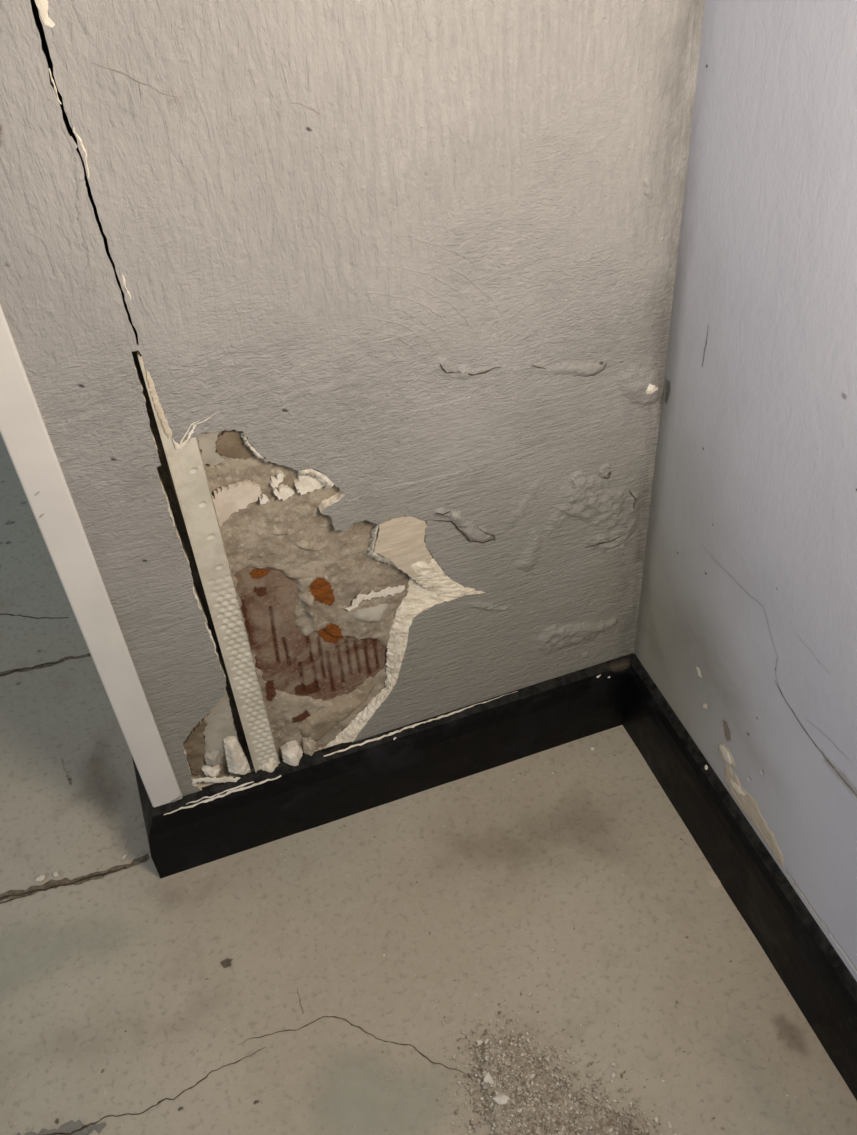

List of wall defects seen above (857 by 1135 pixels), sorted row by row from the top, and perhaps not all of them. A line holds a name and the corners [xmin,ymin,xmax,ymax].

crack [30,0,139,344]
crack [92,63,174,97]
flaking render [132,351,518,815]
crack [700,544,857,796]
crack [0,867,126,904]
crack [87,989,479,1127]